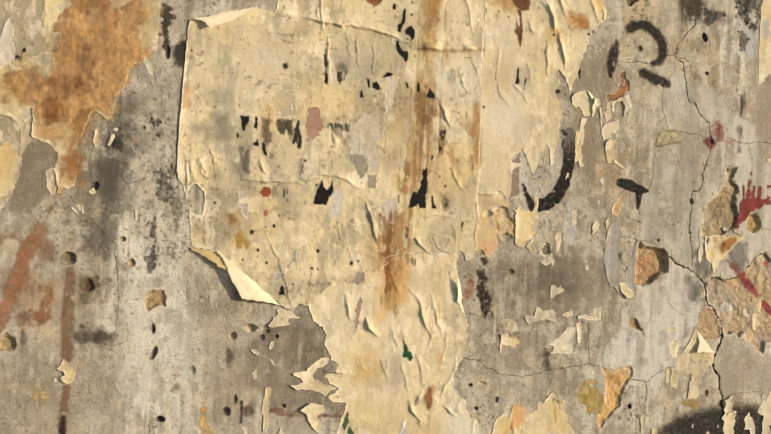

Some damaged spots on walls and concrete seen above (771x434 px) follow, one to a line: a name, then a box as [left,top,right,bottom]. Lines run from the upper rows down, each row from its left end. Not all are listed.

rust [0,0,158,196]
rust [397,0,459,194]
spalling [144,287,169,334]
spalling [221,394,238,416]
spalling [228,323,279,341]
rust [378,204,413,317]
crack [465,328,611,398]
peeling [597,70,771,433]
crack [628,0,771,408]